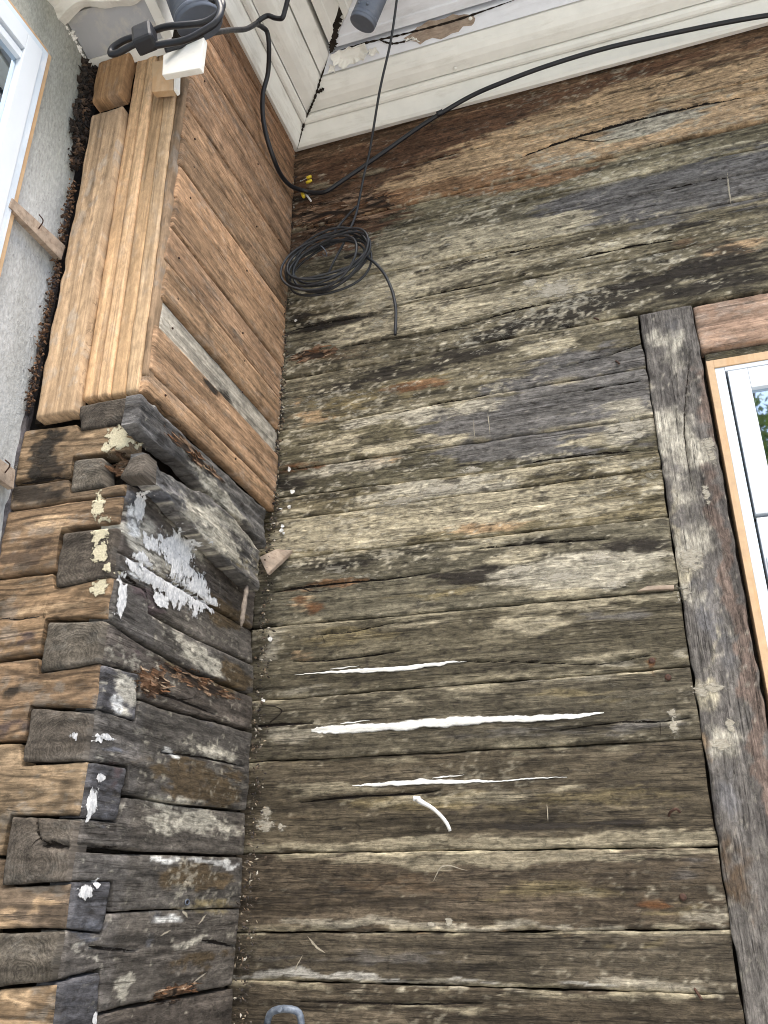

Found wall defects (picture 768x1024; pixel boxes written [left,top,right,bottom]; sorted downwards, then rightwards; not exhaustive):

peeling [404,14,475,44]
peeling [328,43,379,74]
crack [513,98,741,161]
peeling [101,425,146,458]
peeling [89,489,220,619]